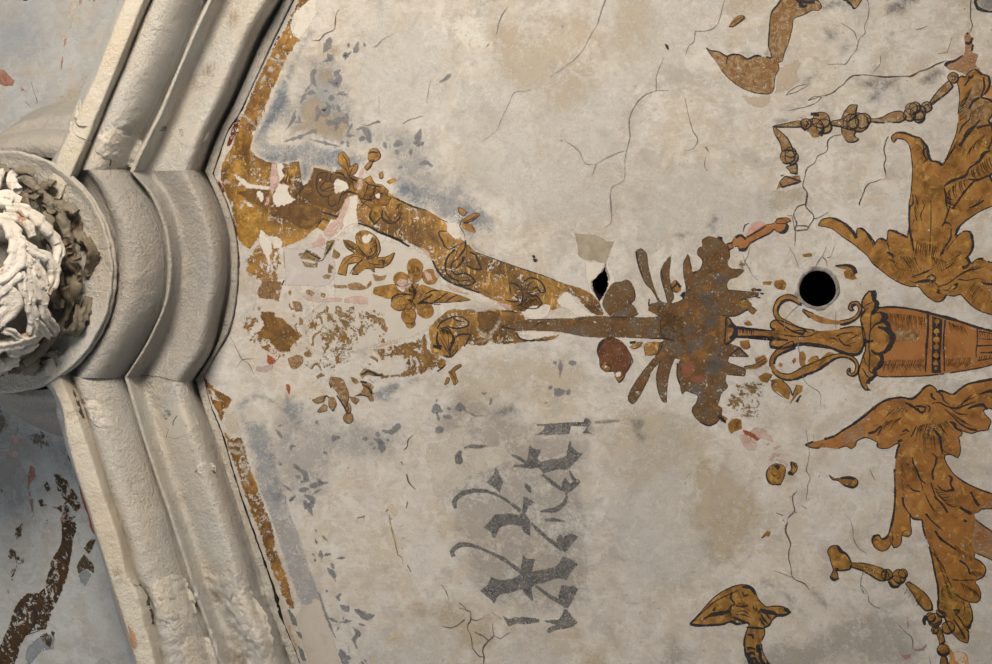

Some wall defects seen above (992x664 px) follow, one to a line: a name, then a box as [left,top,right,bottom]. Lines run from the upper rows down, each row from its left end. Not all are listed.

crack [786,0,973,111]
crack [566,0,725,227]
flaking render [234,163,296,208]
crack [789,134,841,268]
crack [859,136,889,205]
flaking render [258,230,283,271]
spalling [521,233,615,319]
spalling [763,253,858,311]
peeling [243,305,385,372]
crack [777,431,814,590]
peeling [0,474,96,664]
crack [442,586,511,664]